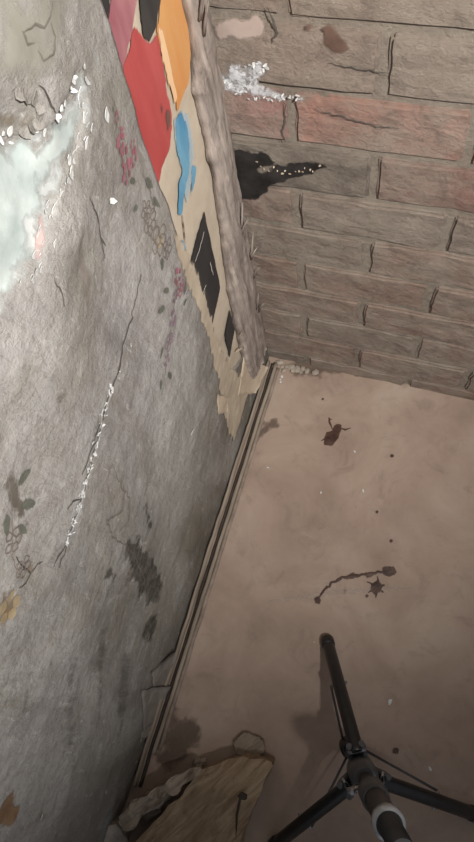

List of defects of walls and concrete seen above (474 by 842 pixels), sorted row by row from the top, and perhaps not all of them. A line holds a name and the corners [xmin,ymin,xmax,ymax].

spalling [216,15,264,39]
crack [315,108,399,129]
peeling [0,64,93,292]
crack [16,274,142,588]
leakage [321,418,350,446]
leakage [107,472,161,605]
leakage [314,566,396,604]
leakage [142,615,157,643]